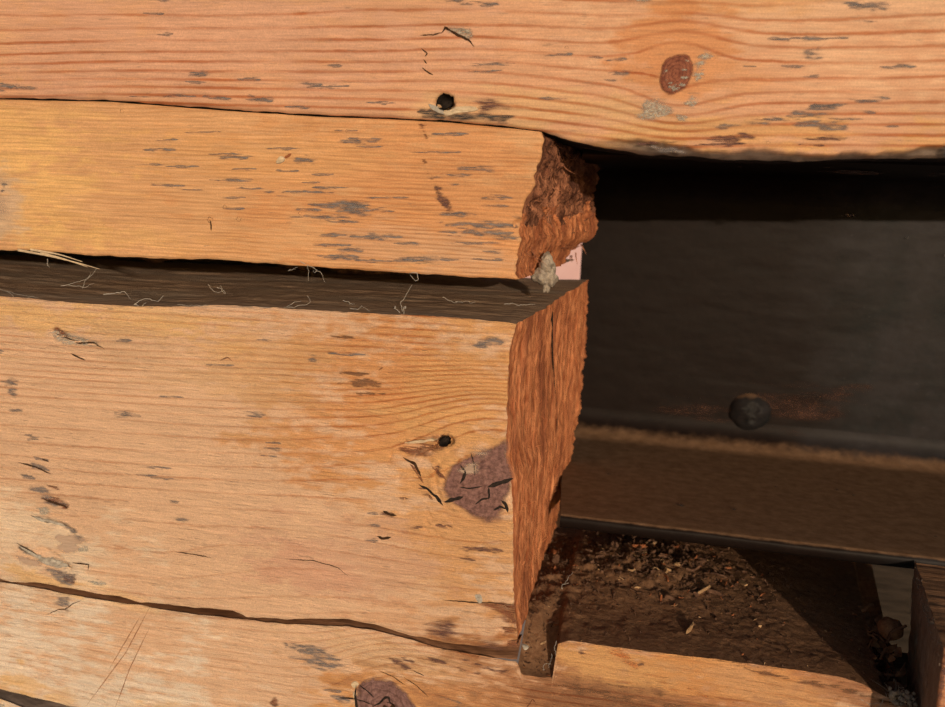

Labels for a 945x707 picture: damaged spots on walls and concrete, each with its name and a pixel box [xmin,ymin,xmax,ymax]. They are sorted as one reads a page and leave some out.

crack [0,579,522,659]
crack [0,689,73,707]